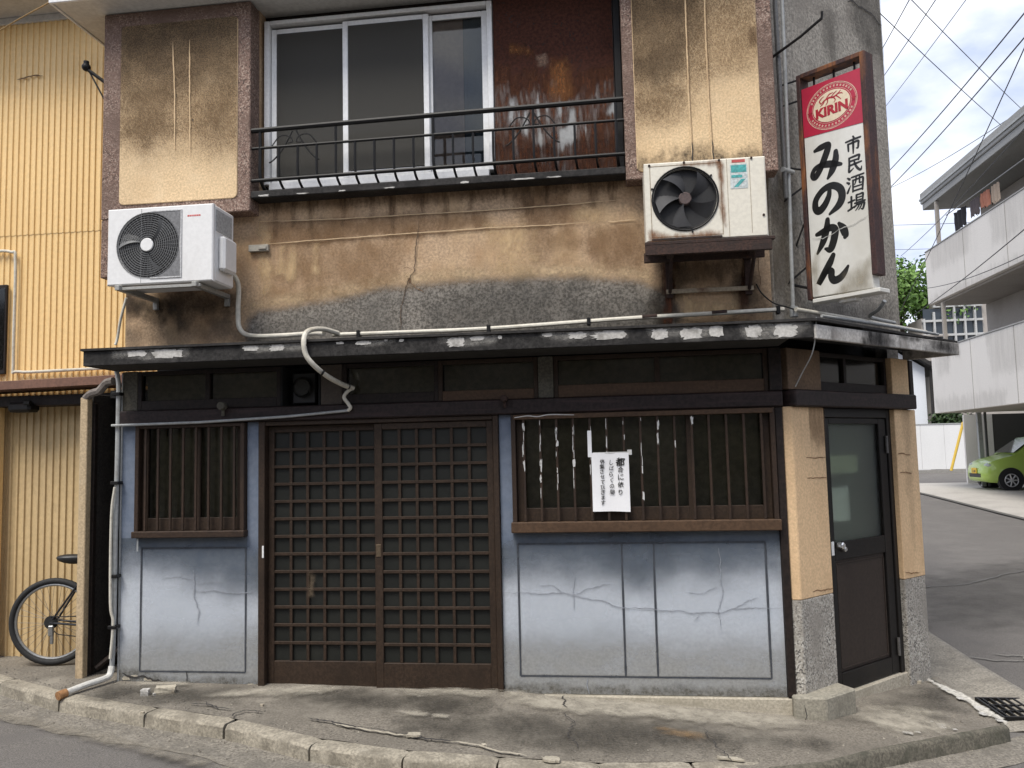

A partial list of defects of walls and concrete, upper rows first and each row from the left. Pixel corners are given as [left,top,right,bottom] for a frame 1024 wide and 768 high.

water stain [120,16,237,150]
crack [173,41,191,151]
rust [493,0,617,175]
crack [259,200,634,328]
peeling [114,348,186,359]
flaking render [242,266,724,352]
peeling [742,321,809,339]
crack [514,554,775,626]
crack [562,678,589,747]